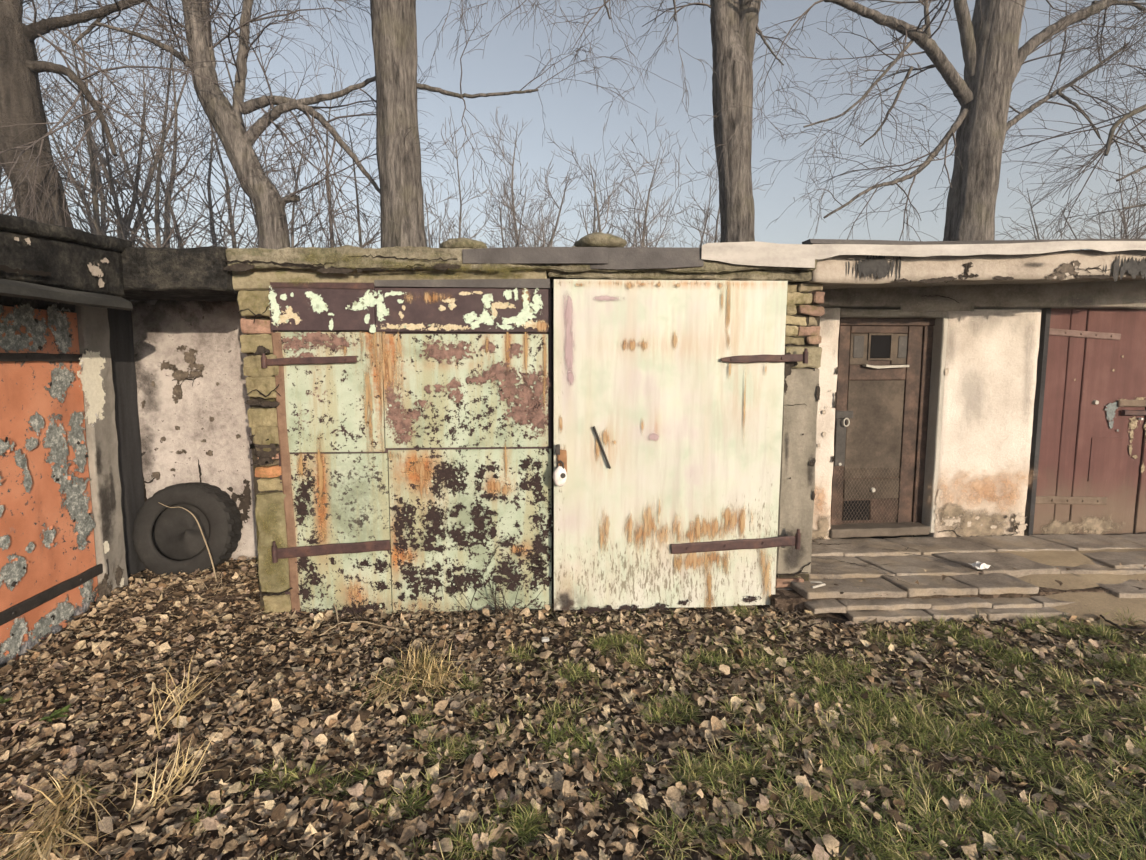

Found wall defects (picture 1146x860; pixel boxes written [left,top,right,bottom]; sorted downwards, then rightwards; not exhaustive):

peeling [0,303,110,554]
damp [134,300,220,408]
rust [360,331,402,442]
peeling [253,286,552,445]
rust [407,293,445,303]
rust [524,321,547,371]
peeling [0,523,57,592]
peeling [0,565,124,660]
peeling [284,458,554,616]
rust [626,500,753,607]
rust [761,551,771,598]
damp [938,476,1025,537]